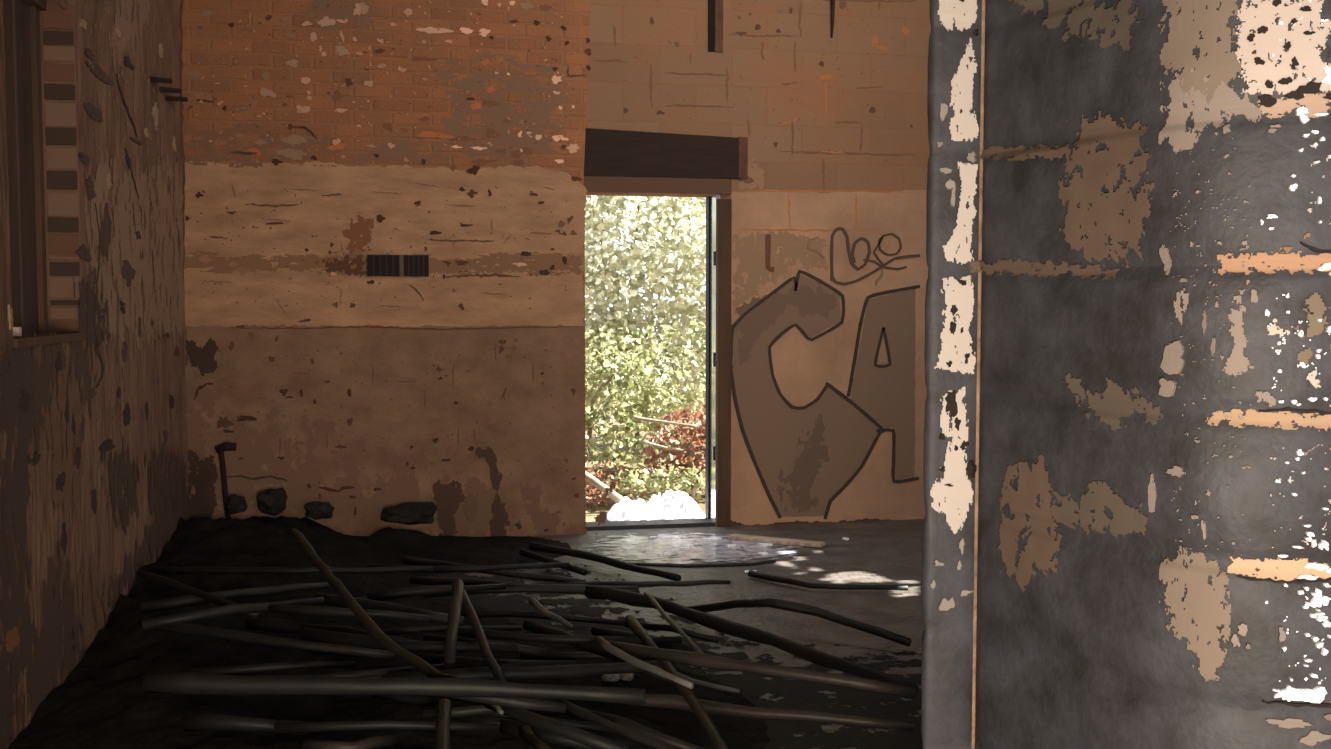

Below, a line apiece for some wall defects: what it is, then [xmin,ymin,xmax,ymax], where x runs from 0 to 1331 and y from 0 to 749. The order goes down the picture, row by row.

peeling [1158,0,1331,154]
peeling [930,0,979,611]
peeling [1159,244,1189,397]
peeling [1202,280,1258,376]
peeling [1267,318,1295,338]
peeling [1255,391,1276,407]
peeling [1307,369,1321,388]
water stain [186,368,617,537]
peeling [1148,466,1186,513]
peeling [1159,515,1250,682]
peeling [1302,588,1329,622]
peeling [1265,685,1331,746]